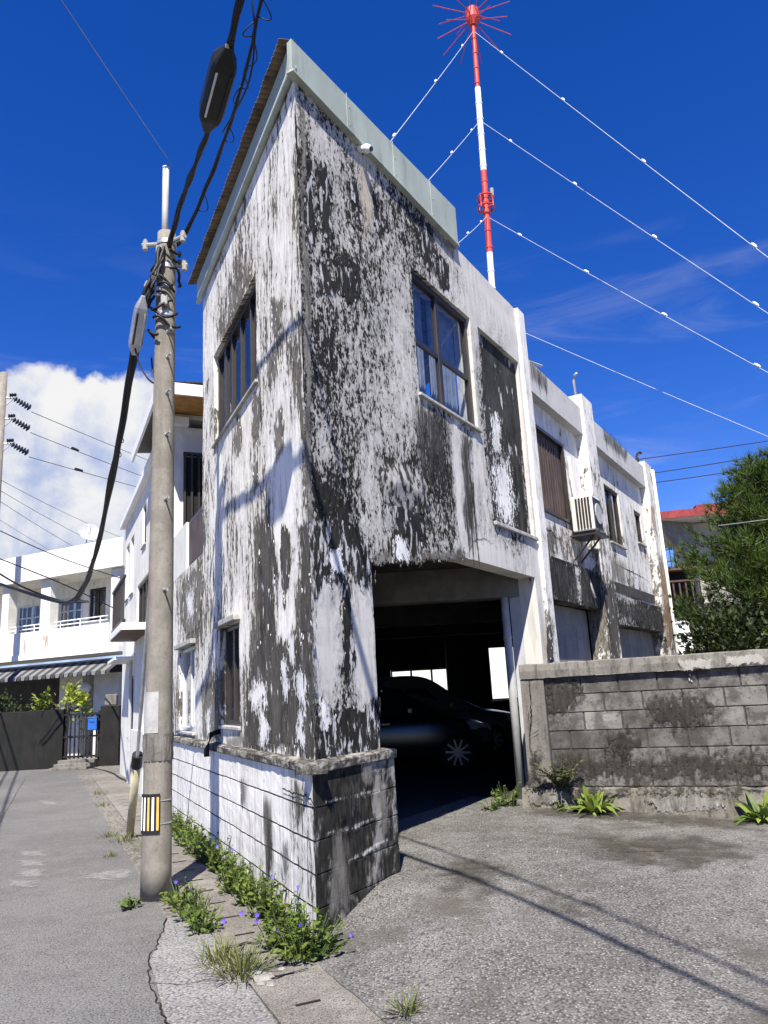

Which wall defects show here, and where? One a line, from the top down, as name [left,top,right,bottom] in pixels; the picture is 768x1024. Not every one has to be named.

damp [359,158,372,237]
damp [415,334,528,566]
damp [549,556,603,612]
damp [611,558,626,583]
damp [616,597,664,631]
damp [545,679,586,722]
damp [639,691,720,733]
damp [604,724,642,761]
damp [328,766,387,915]